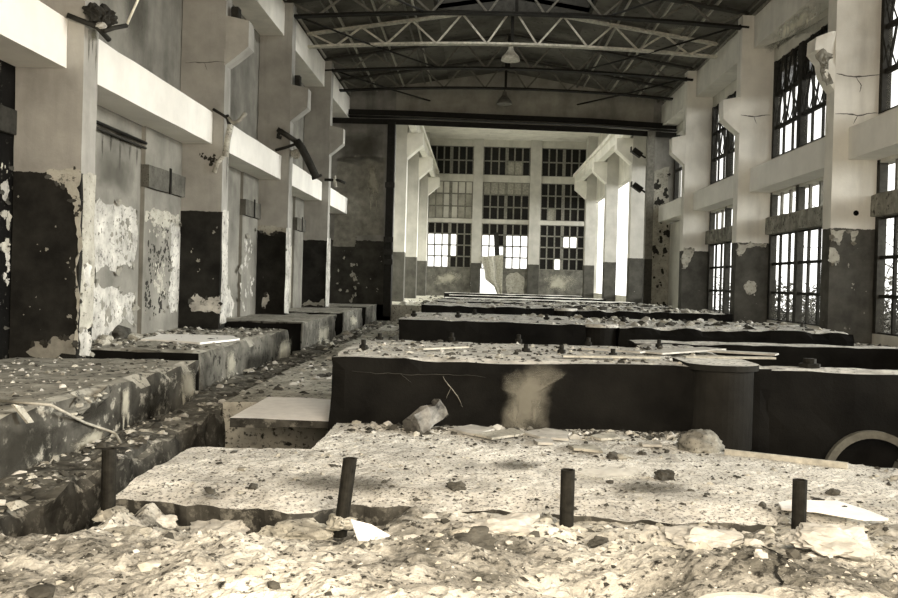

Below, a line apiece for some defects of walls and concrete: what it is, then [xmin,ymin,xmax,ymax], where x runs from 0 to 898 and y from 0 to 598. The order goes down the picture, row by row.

peeling [0,163,19,286]